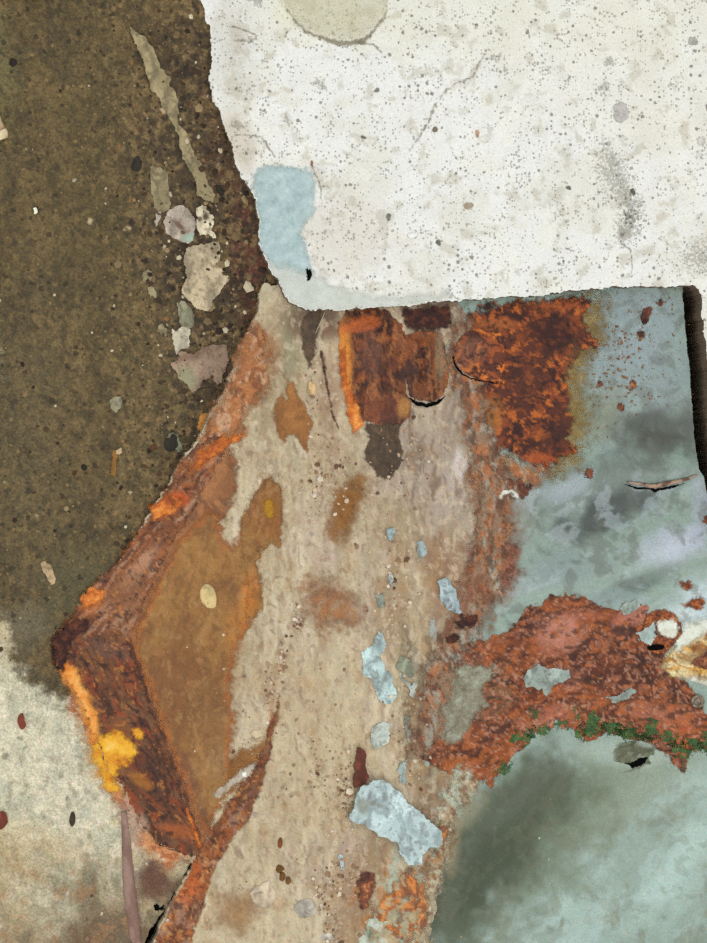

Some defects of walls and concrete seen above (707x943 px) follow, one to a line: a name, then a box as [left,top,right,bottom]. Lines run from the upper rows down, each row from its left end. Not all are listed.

damp [0,0,277,700]
corrosion [273,382,313,453]
corrosion [338,293,610,507]
corrosion [51,322,283,943]
peeling [416,541,427,559]
peeling [349,574,707,865]
crack [145,917,159,943]
corrosion [356,868,428,943]